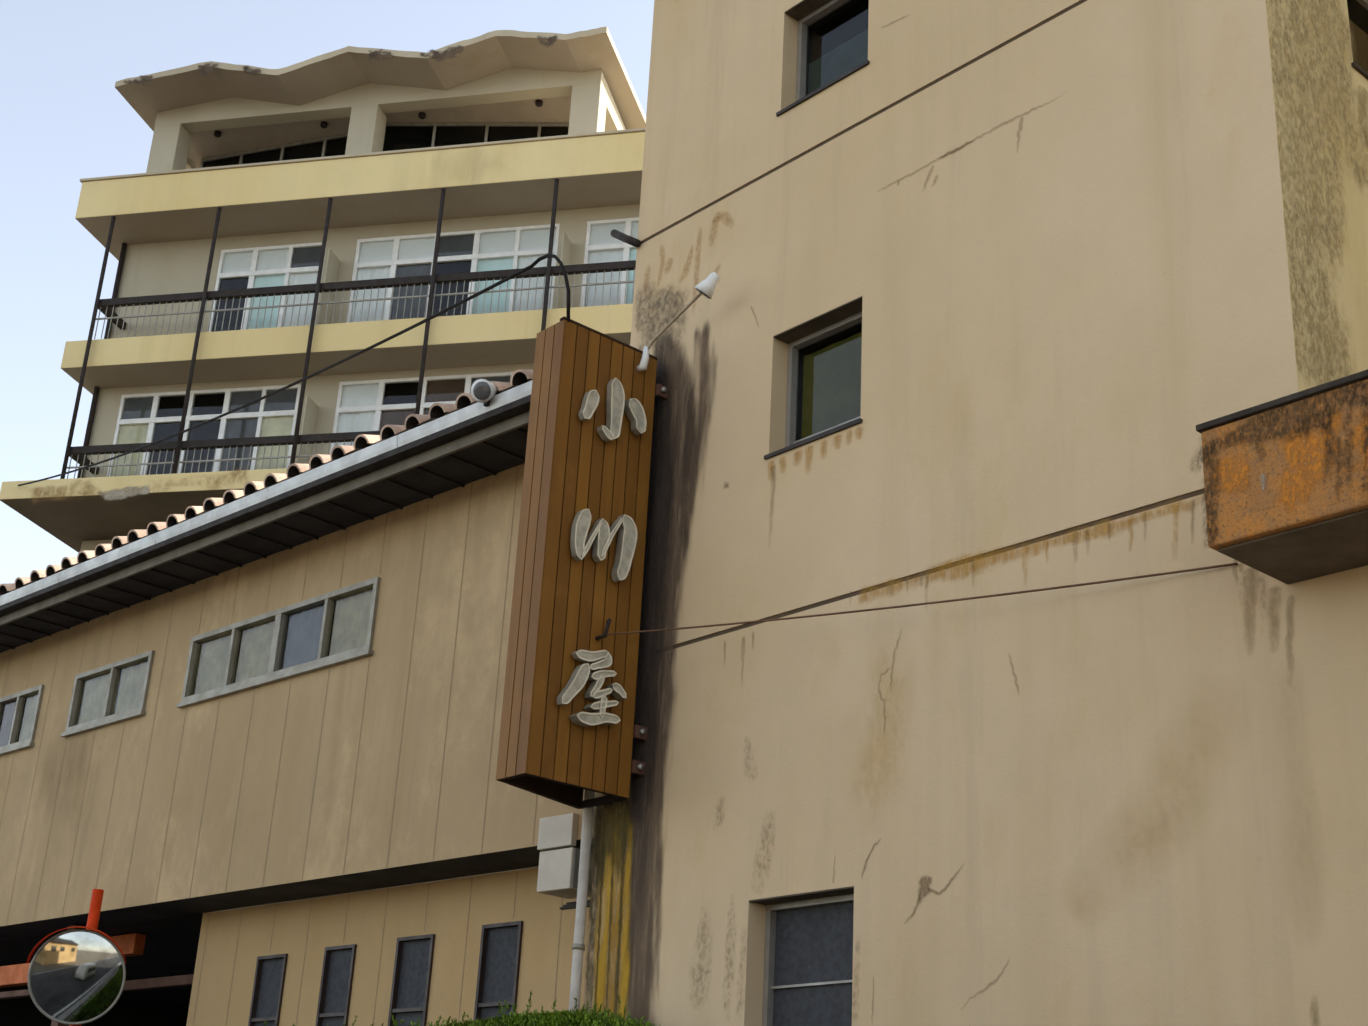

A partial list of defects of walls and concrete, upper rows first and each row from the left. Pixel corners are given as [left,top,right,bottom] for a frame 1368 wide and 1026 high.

water stain [1193,0,1368,544]
water stain [586,291,710,1026]